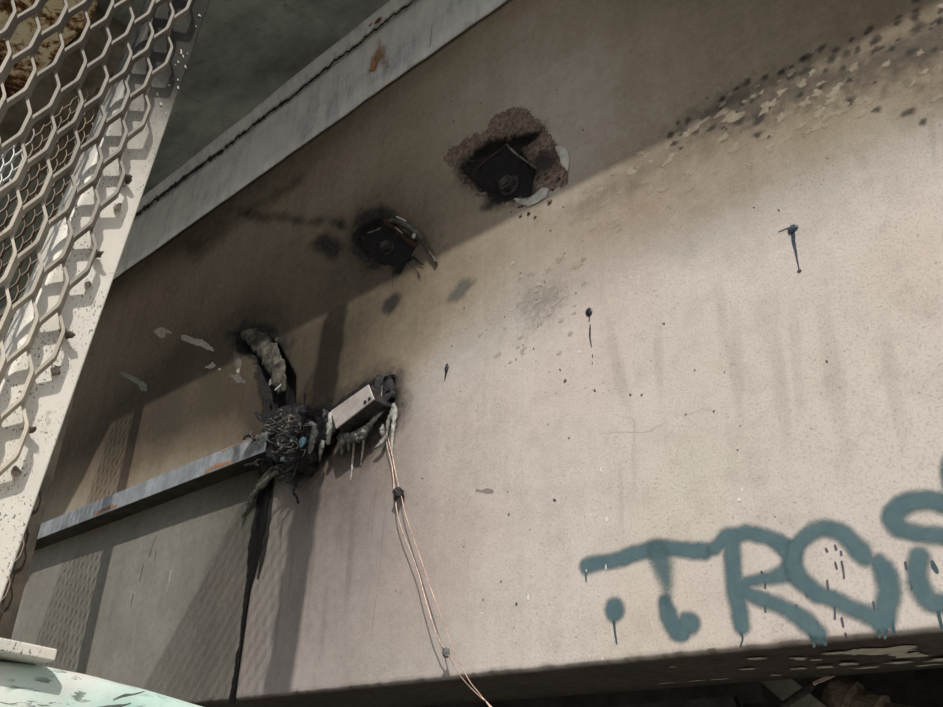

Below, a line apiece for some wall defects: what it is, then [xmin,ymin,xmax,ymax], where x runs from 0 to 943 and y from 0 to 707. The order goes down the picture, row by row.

rust [369,42,383,71]
spalling [444,107,569,219]
spalling [154,320,296,429]